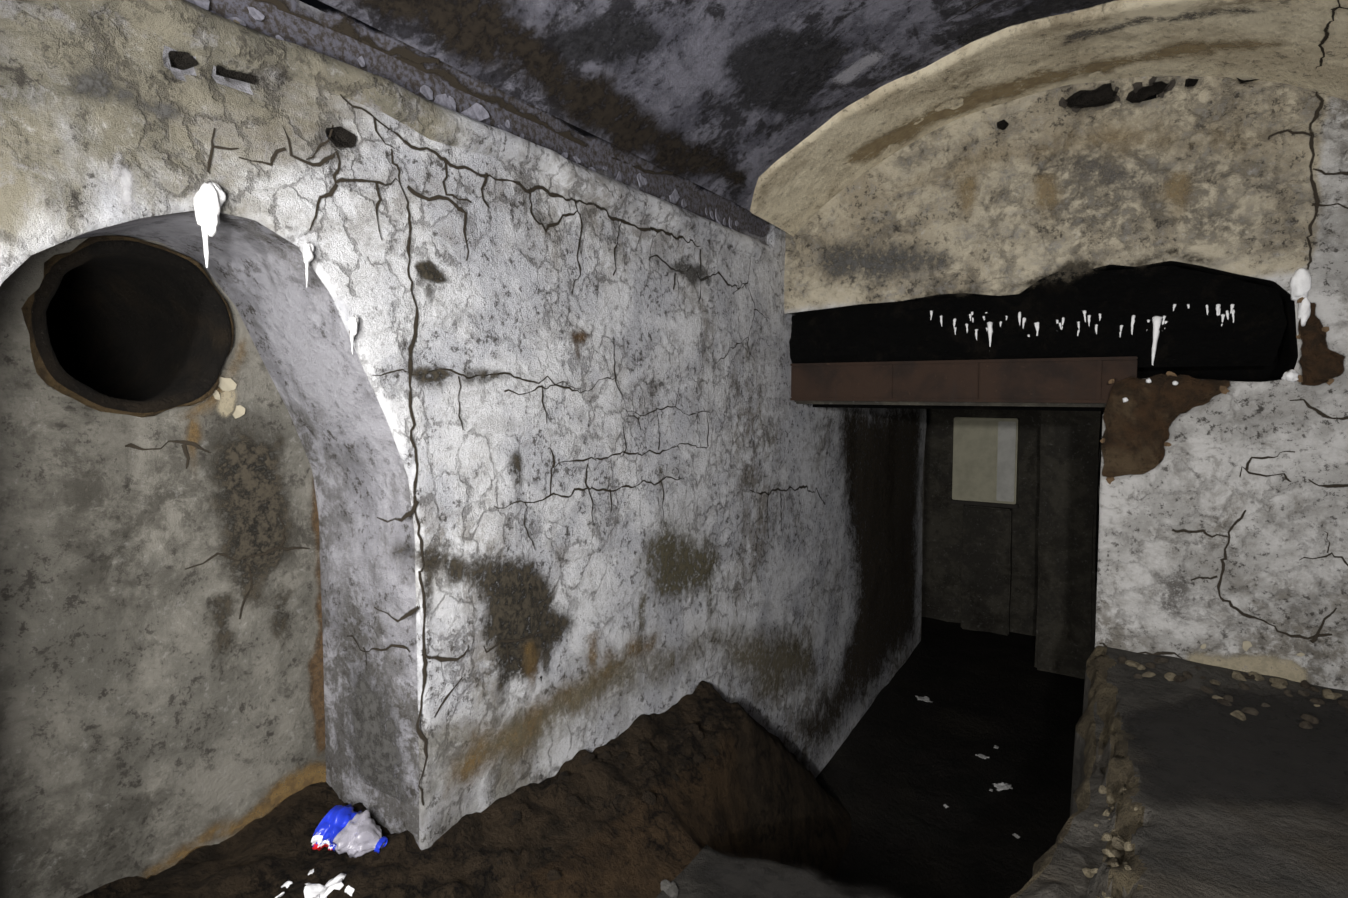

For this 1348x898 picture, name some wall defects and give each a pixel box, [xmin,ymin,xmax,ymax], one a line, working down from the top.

crack [1268,0,1348,269]
crack [125,440,211,469]
damp [392,546,573,702]
crack [207,94,768,806]
damp [511,452,521,499]
damp [639,523,719,637]
crack [750,485,825,537]
spalling [1100,371,1230,484]
crack [1172,510,1337,643]
crack [1239,451,1348,488]
crack [1290,399,1348,420]
crack [1299,531,1348,566]